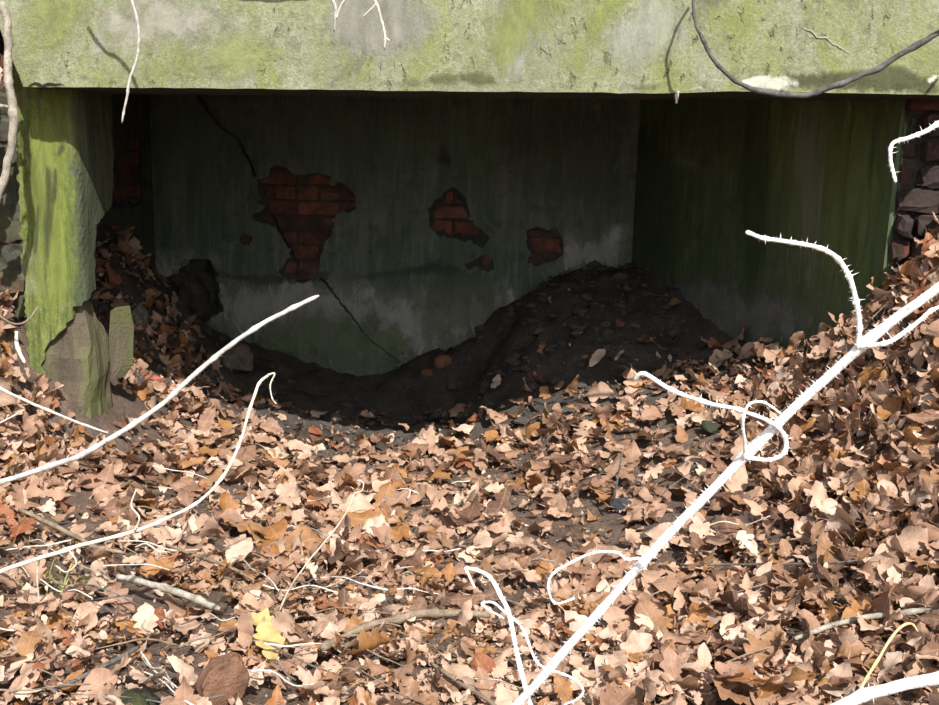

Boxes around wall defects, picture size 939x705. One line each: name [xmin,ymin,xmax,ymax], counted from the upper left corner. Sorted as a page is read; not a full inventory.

crack [196,95,263,177]
damp [29,88,75,306]
flaking render [237,165,356,285]
flaking render [428,187,494,275]
flaking render [523,227,564,267]
damp [563,226,626,271]
crack [318,277,402,364]
damp [215,278,515,365]